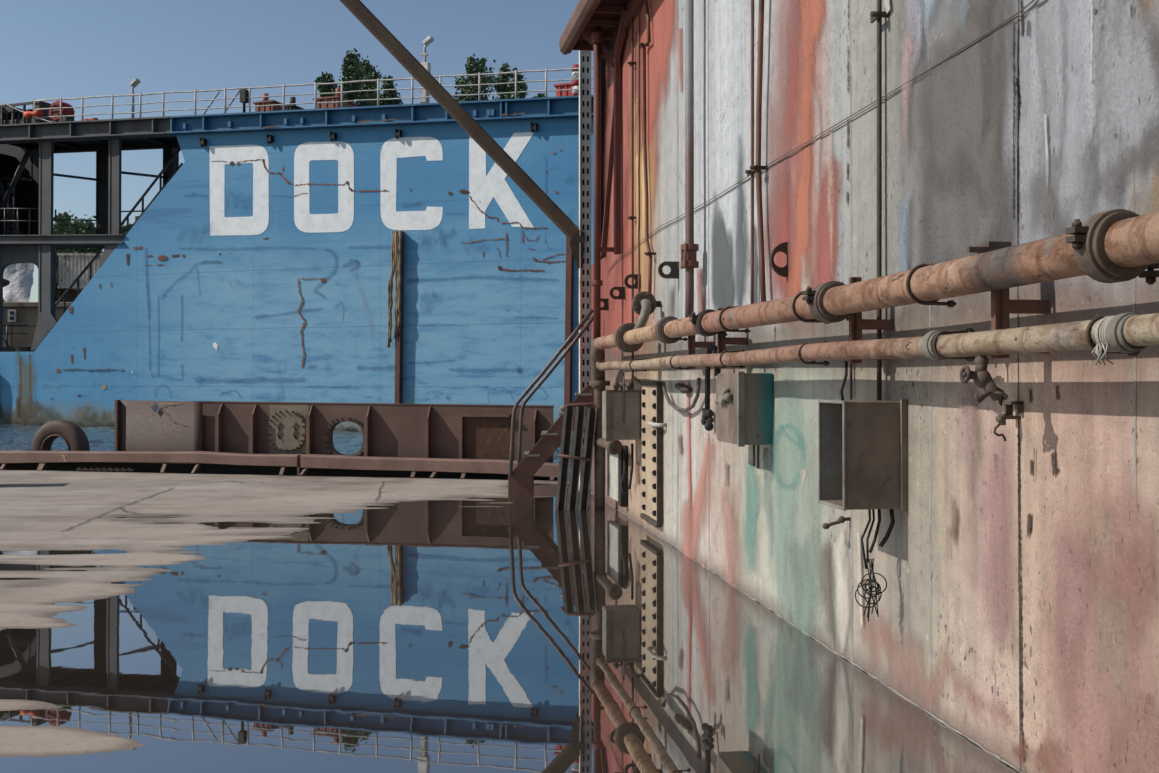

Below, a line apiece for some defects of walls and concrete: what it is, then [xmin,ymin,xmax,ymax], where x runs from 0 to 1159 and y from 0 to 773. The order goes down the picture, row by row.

corrosion [126,247,185,266]
corrosion [461,233,565,272]
corrosion [298,278,326,368]
corrosion [51,347,124,399]